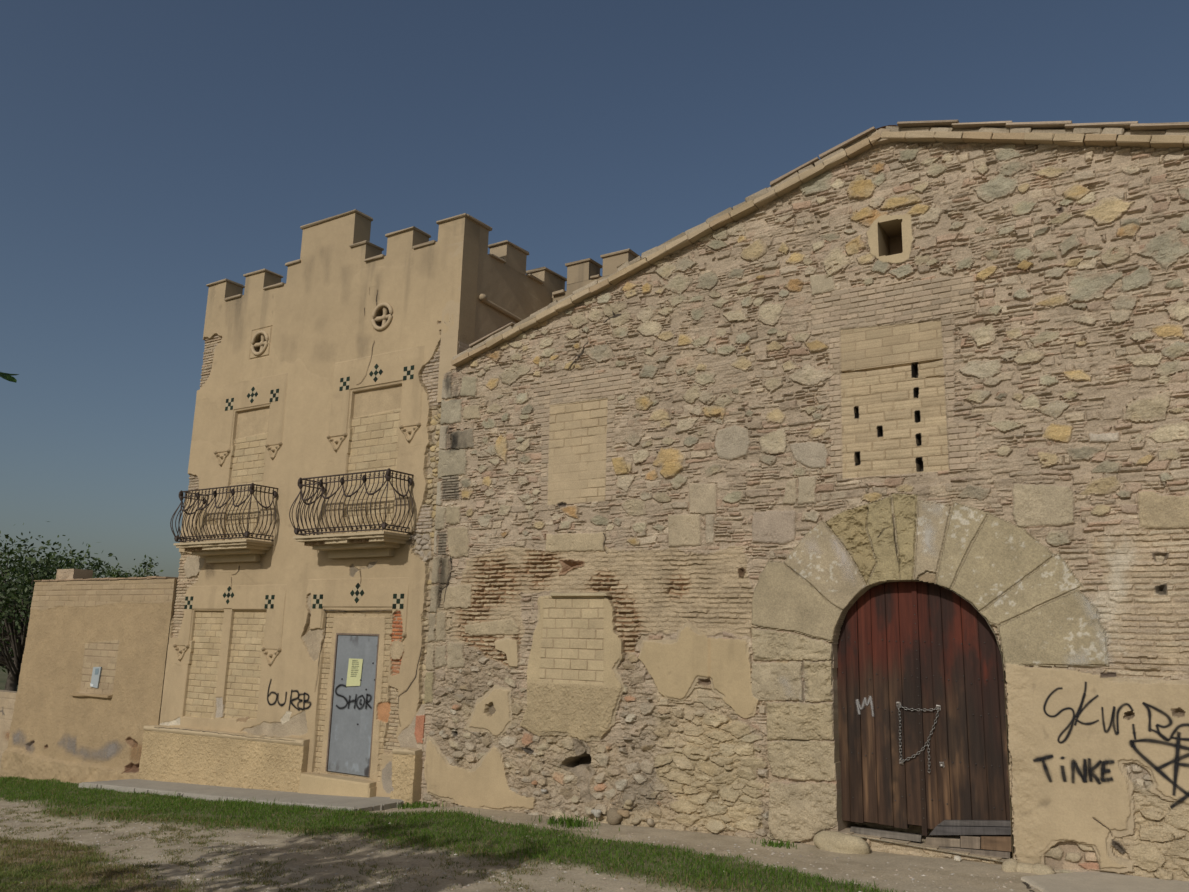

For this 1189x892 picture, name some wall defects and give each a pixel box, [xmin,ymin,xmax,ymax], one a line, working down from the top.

flaking render [200,333,222,389]
flaking render [458,332,474,351]
spalling [378,342,760,811]
flaking render [1005,661,1189,874]